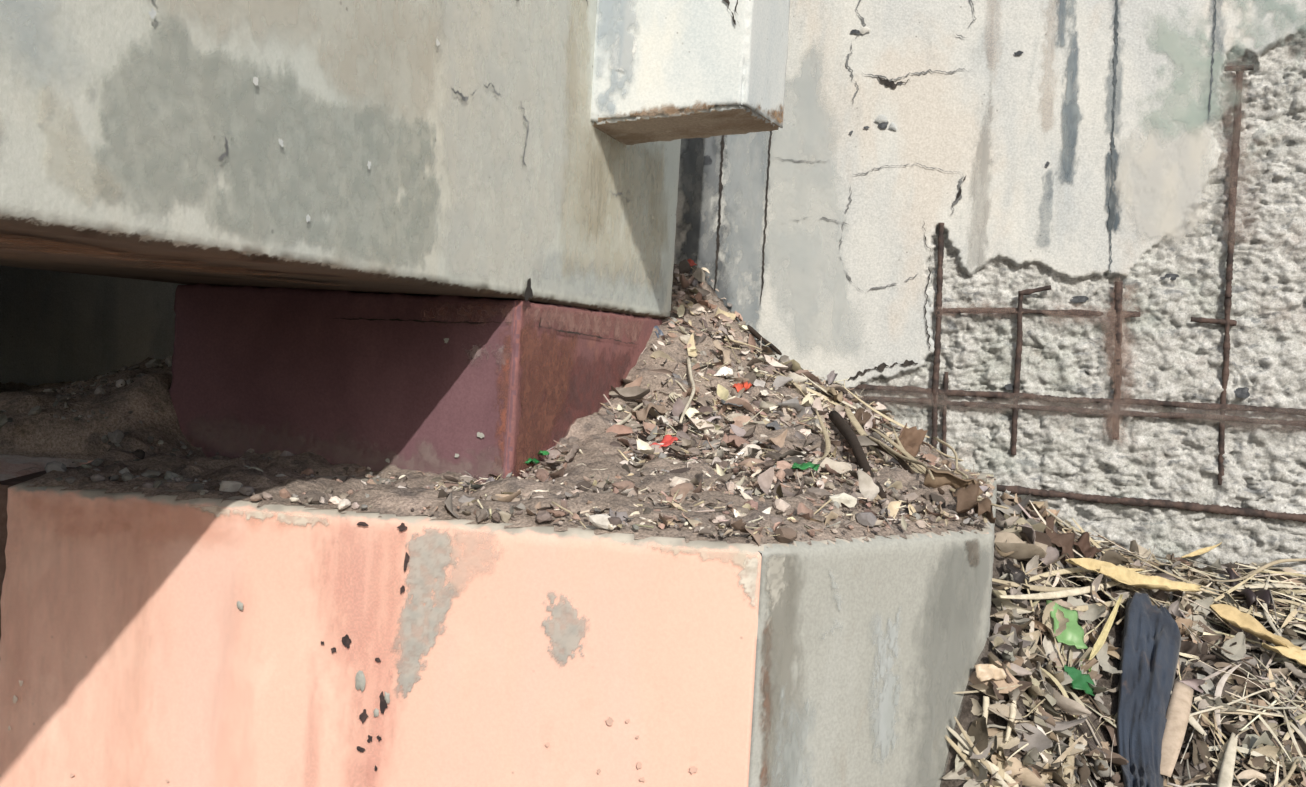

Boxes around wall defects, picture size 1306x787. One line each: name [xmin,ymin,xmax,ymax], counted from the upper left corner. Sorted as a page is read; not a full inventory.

crack [846,0,976,103]
leakage [1057,0,1082,183]
leakage [1107,45,1122,132]
leakage [1106,149,1121,231]
crack [776,157,967,380]
spalling [849,28,1306,575]
peeling [321,634,352,653]
peeling [355,670,366,692]
peeling [357,523,457,753]
peeling [542,593,586,664]